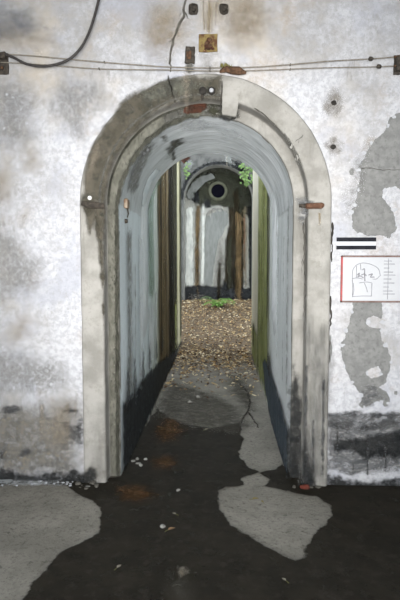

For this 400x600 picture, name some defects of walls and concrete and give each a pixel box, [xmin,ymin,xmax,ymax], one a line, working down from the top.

crack [165,0,188,112]
spalling [348,113,400,239]
water stain [81,76,224,476]
water stain [0,161,400,600]
crack [239,383,259,428]
spalling [329,302,397,409]